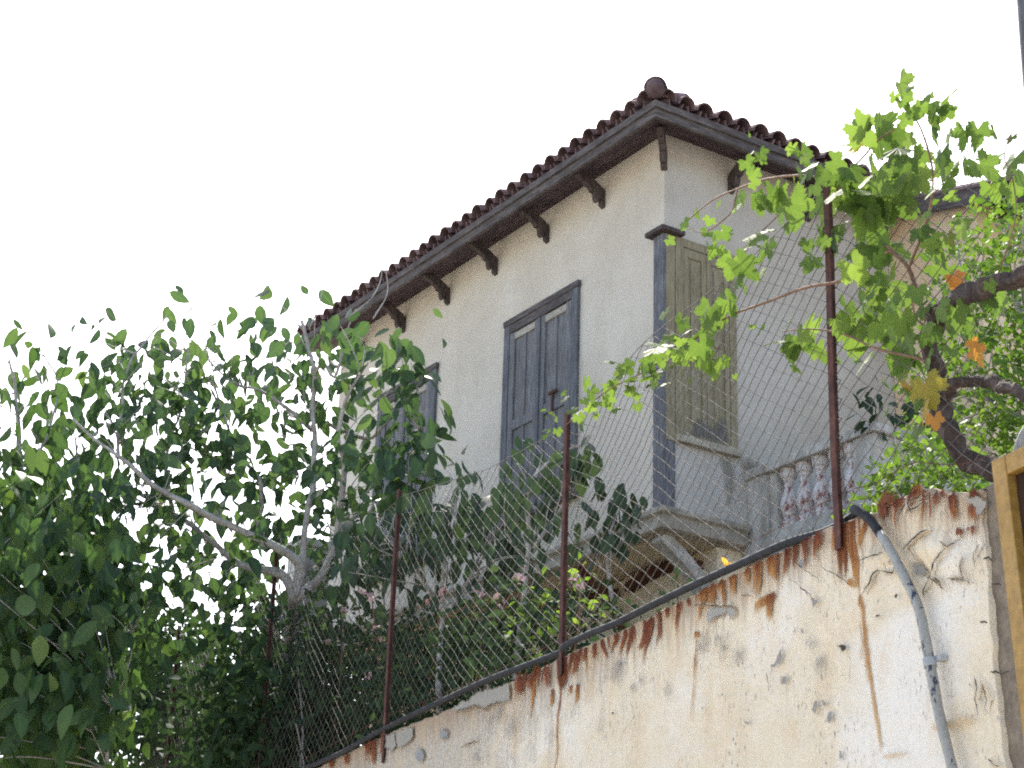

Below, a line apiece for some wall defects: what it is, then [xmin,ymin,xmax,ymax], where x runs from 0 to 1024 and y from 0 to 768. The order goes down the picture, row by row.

crack [789,491,1002,616]
rust [514,484,979,768]
rust [364,733,383,763]